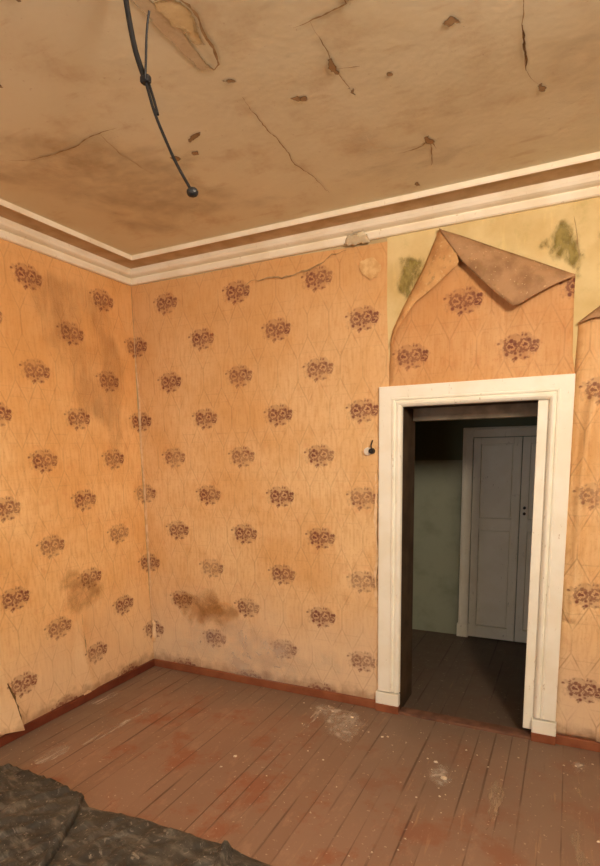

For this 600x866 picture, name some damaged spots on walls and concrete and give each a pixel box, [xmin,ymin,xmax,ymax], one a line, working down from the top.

peeling [132,0,220,70]
crack [521,0,546,92]
damp [399,258,421,297]
peeling [387,197,600,367]
damp [545,221,580,266]